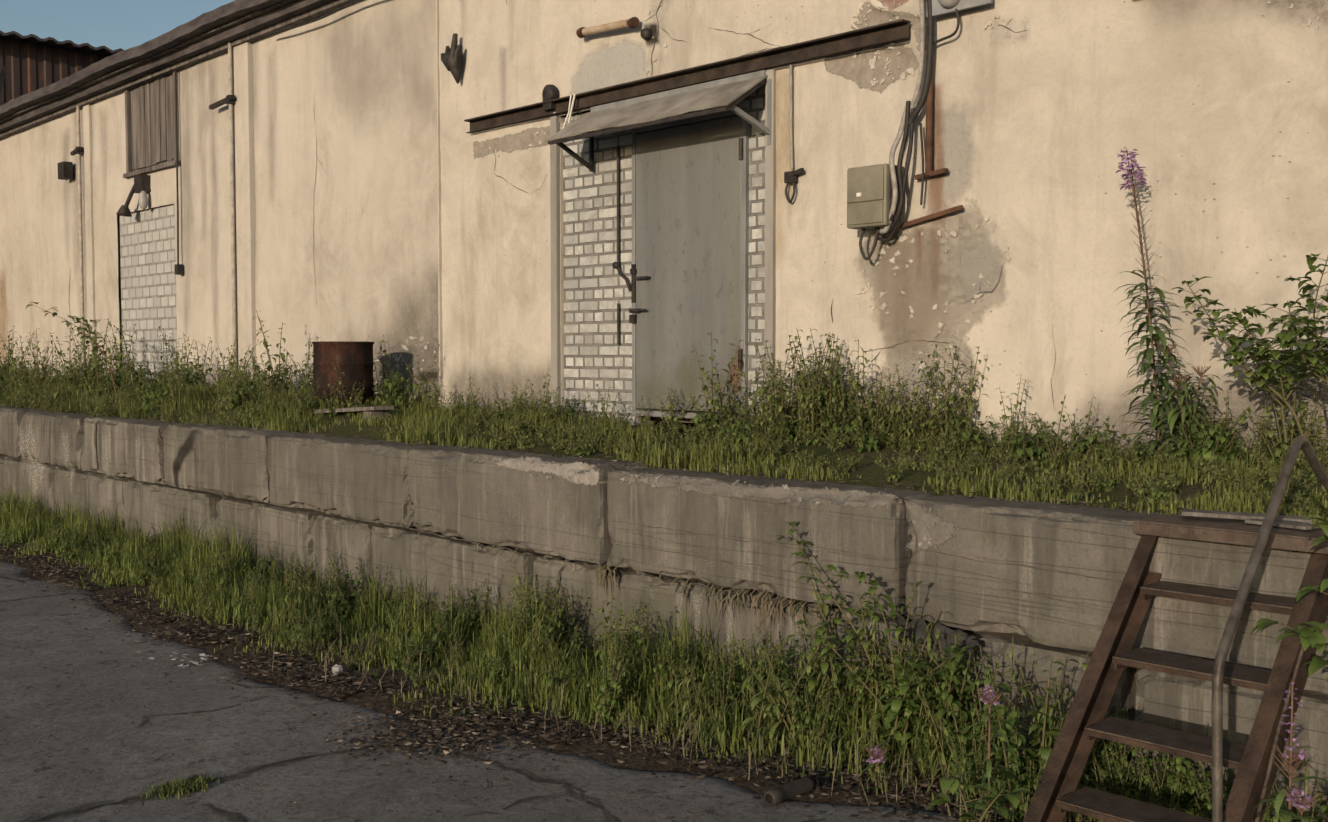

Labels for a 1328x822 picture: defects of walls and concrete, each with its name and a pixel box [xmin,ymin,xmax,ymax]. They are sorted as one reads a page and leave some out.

crack [645,0,783,77]
peeling [825,0,928,93]
flaking render [473,121,579,159]
peeling [857,221,957,318]
peeling [918,301,971,370]
crack [371,466,889,620]
spalling [496,456,959,550]
crack [921,550,1122,608]